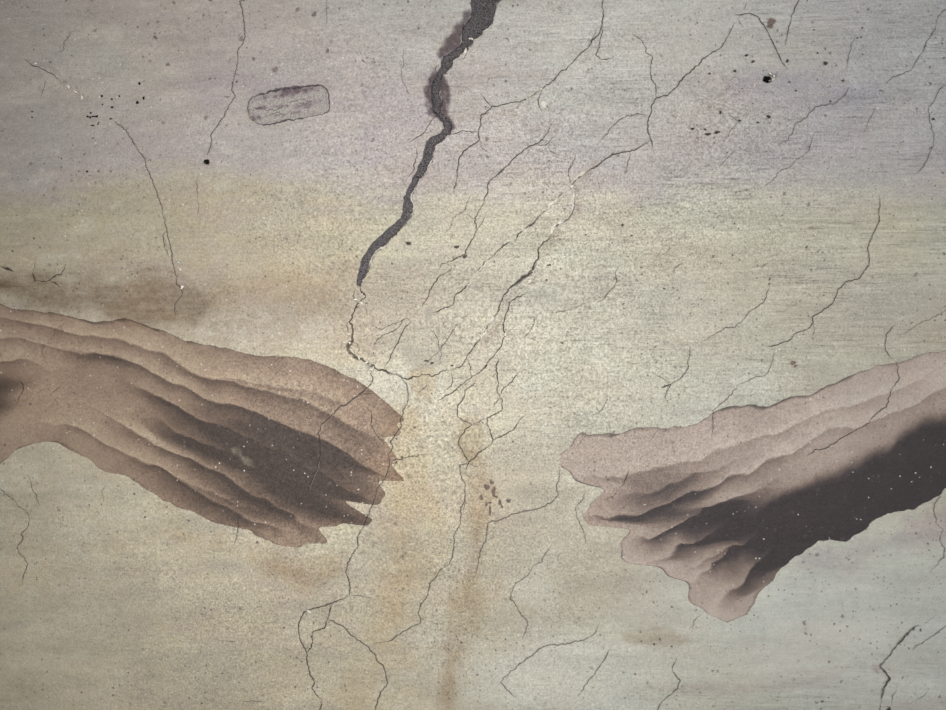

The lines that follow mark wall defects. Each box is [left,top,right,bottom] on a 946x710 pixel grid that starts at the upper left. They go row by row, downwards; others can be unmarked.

crack [207,0,245,154]
crack [115,122,184,312]
crack [769,207,880,347]
crack [298,0,798,710]
crack [811,328,909,454]
crack [880,626,946,710]